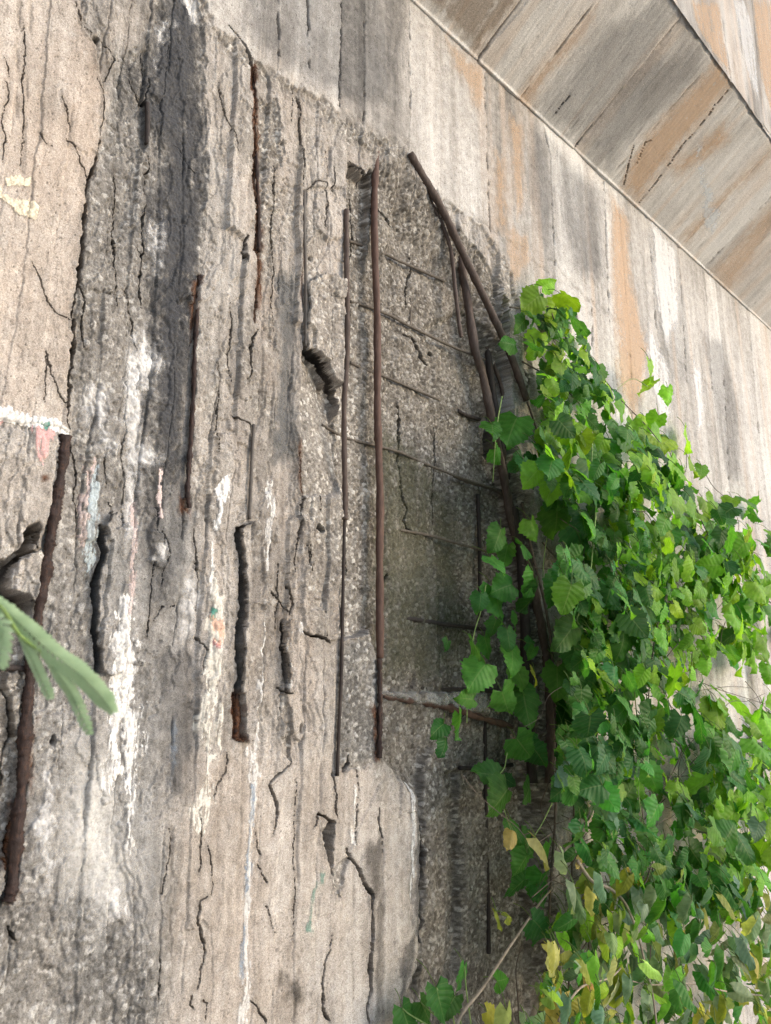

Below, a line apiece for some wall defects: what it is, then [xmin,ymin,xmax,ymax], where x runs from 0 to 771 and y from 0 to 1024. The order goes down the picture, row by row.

crack [1,1,165,531]
water stain [124,0,206,537]
rust [250,64,263,308]
crack [146,507,209,669]
efflorescence [181,577,198,633]
rust [231,694,247,742]
spalling [0,0,562,1024]
crack [270,452,331,653]
rust [0,821,12,869]
crack [189,752,229,1019]
crack [255,754,383,1023]
crack [250,1000,267,1022]